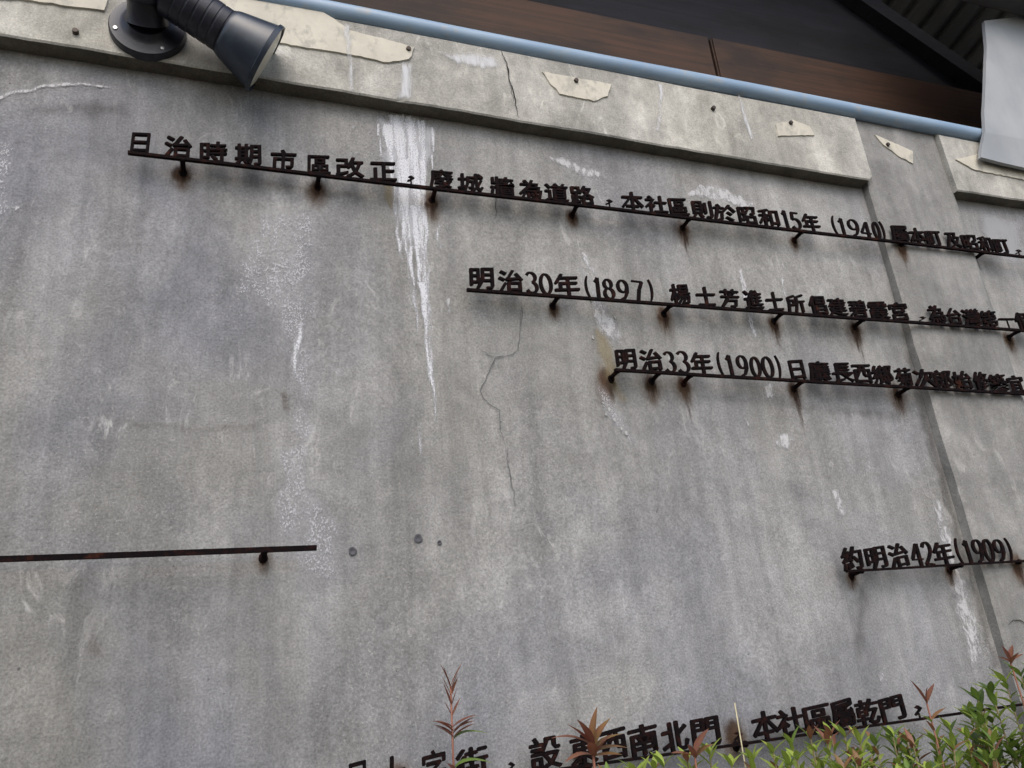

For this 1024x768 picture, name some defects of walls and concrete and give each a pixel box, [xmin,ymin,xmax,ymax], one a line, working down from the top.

crack [501,51,518,115]
efflorescence [377,113,440,413]
crack [480,302,523,508]
rust [601,369,616,397]
water stain [934,500,981,662]